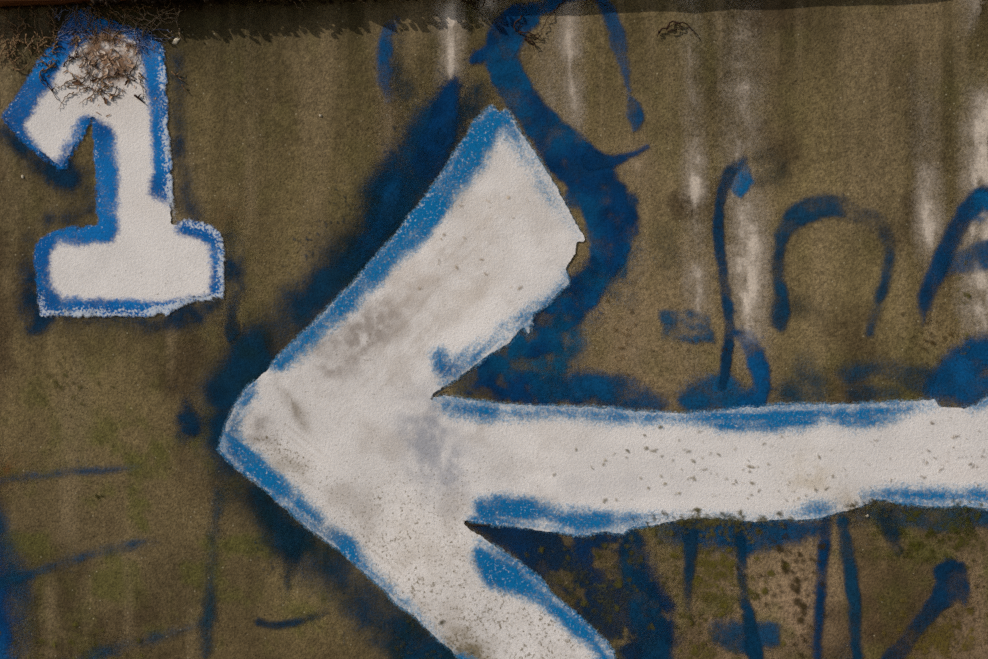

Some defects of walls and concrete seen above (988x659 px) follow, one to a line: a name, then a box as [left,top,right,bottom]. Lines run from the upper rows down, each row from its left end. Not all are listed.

damp [439,0,461,80]
damp [559,0,579,116]
damp [684,151,706,206]
damp [688,264,703,313]
damp [727,180,769,345]
damp [917,168,942,251]
damp [962,92,988,192]
damp [962,209,988,253]
damp [962,261,988,332]